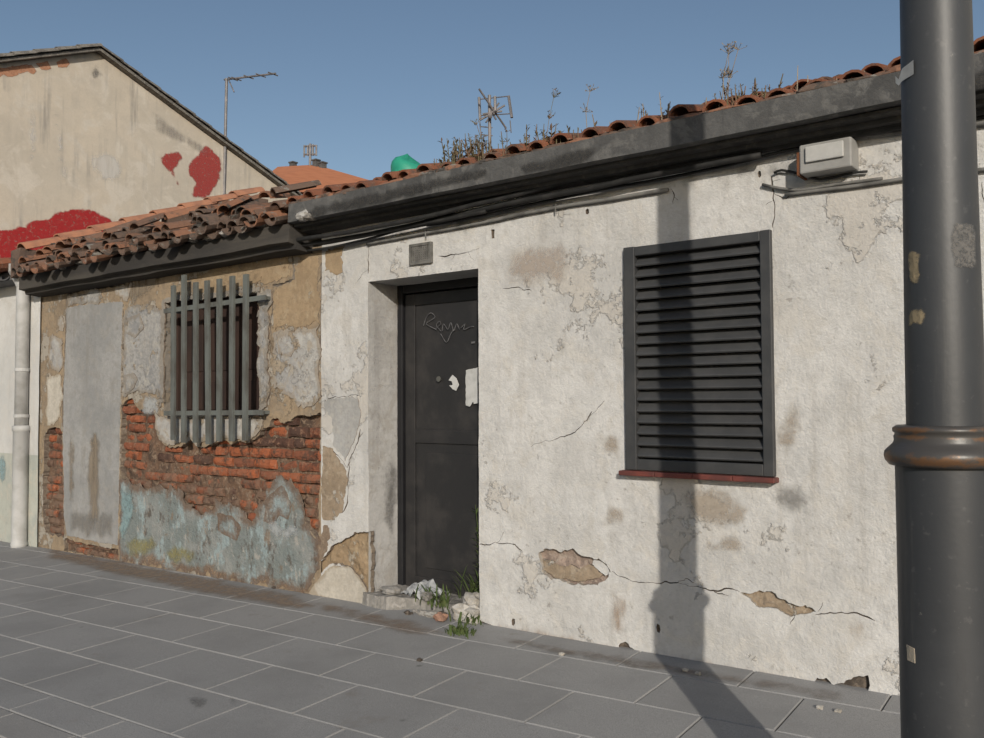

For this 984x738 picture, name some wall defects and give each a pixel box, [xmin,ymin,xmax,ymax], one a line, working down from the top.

flaking render [42,288,119,560]
flaking render [115,283,361,540]
crack [531,401,604,447]
spalling [321,531,375,592]
spalling [538,548,611,586]
crack [612,571,740,596]